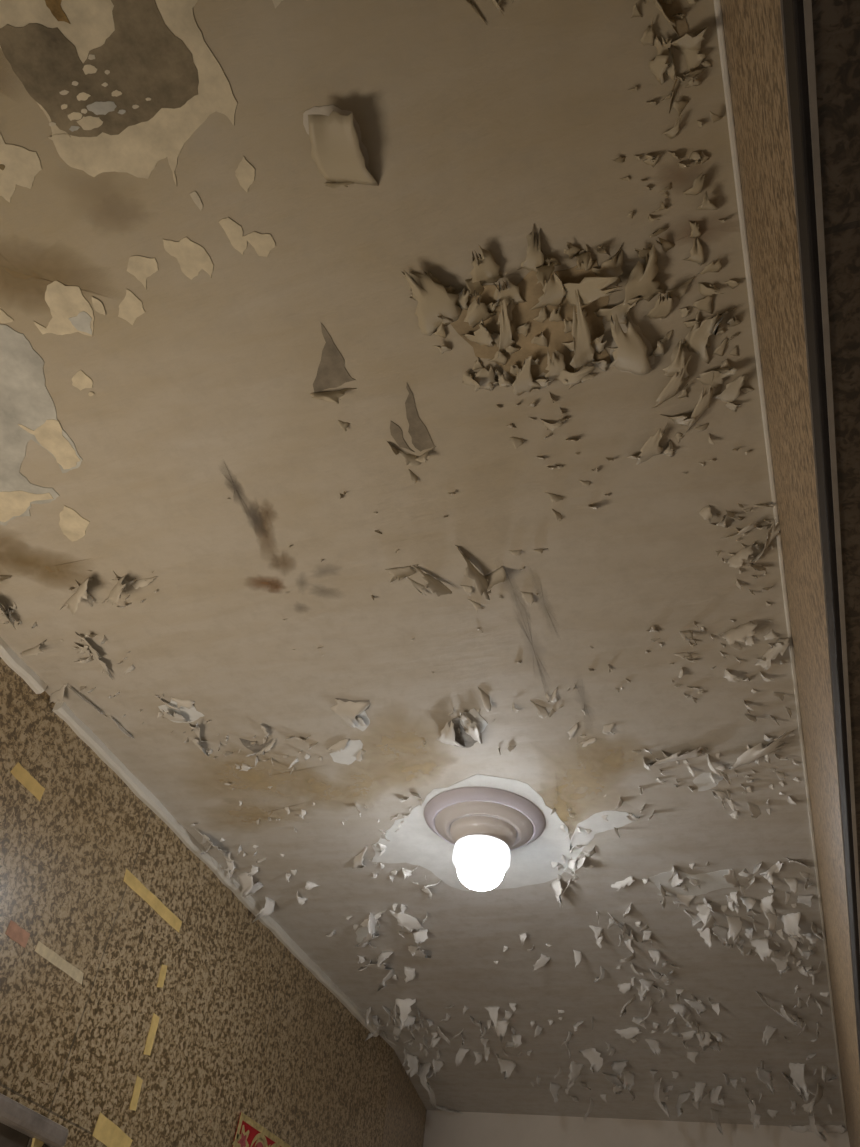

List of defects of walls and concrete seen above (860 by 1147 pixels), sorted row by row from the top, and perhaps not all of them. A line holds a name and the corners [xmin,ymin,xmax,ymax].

peeling [401,0,755,486]
peeling [310,323,357,404]
peeling [387,384,435,484]
peeling [154,693,370,806]
peeling [423,687,495,748]
peeling [634,504,801,820]
peeling [190,823,284,923]
peeling [285,870,320,906]
peeling [352,774,654,907]
peeling [346,904,431,991]
peeling [365,902,722,1120]
peeling [611,858,847,1141]